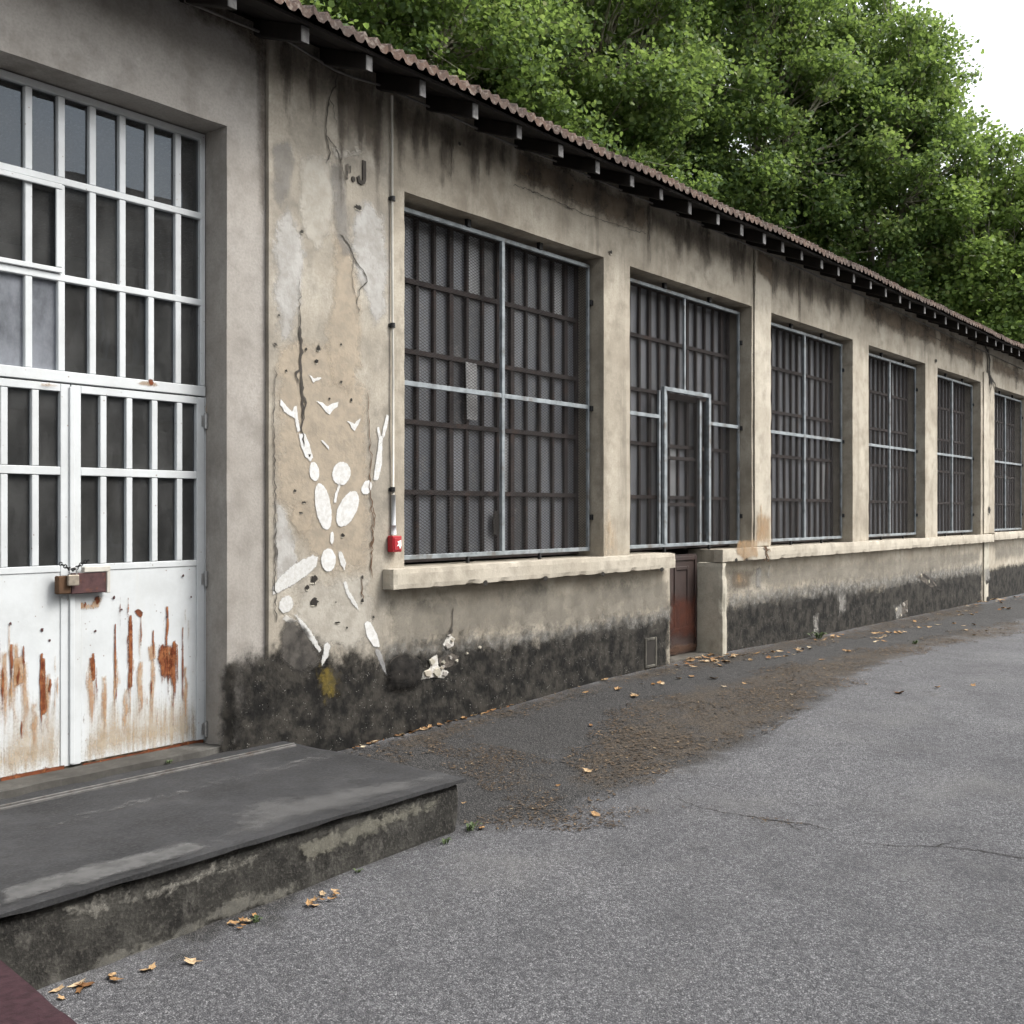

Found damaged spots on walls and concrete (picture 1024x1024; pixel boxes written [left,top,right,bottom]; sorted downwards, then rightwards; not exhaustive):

crack [326,68,347,191]
crack [339,234,368,313]
crack [273,282,307,622]
peeling [273,148,375,647]
rust [0,640,64,781]
rust [81,596,100,609]
rust [82,604,203,765]
water stain [218,584,671,753]
spalling [422,634,482,680]
water stain [726,545,1024,652]
water stain [126,855,256,900]
water stain [96,884,293,967]